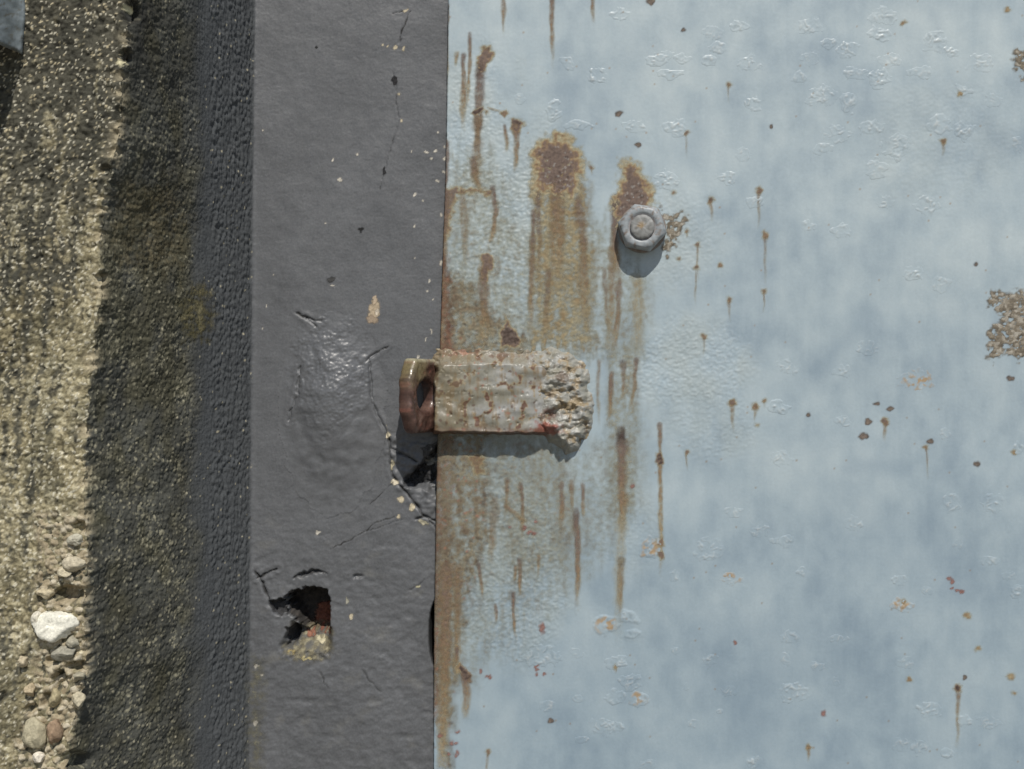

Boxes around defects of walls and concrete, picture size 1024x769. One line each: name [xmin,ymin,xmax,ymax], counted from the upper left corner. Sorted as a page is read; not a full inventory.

corrosion [440,36,595,354]
corrosion [597,157,656,524]
peeling [985,290,1024,359]
crack [340,432,436,545]
corrosion [656,423,664,559]
hole [271,570,333,661]
corrosion [434,433,584,768]